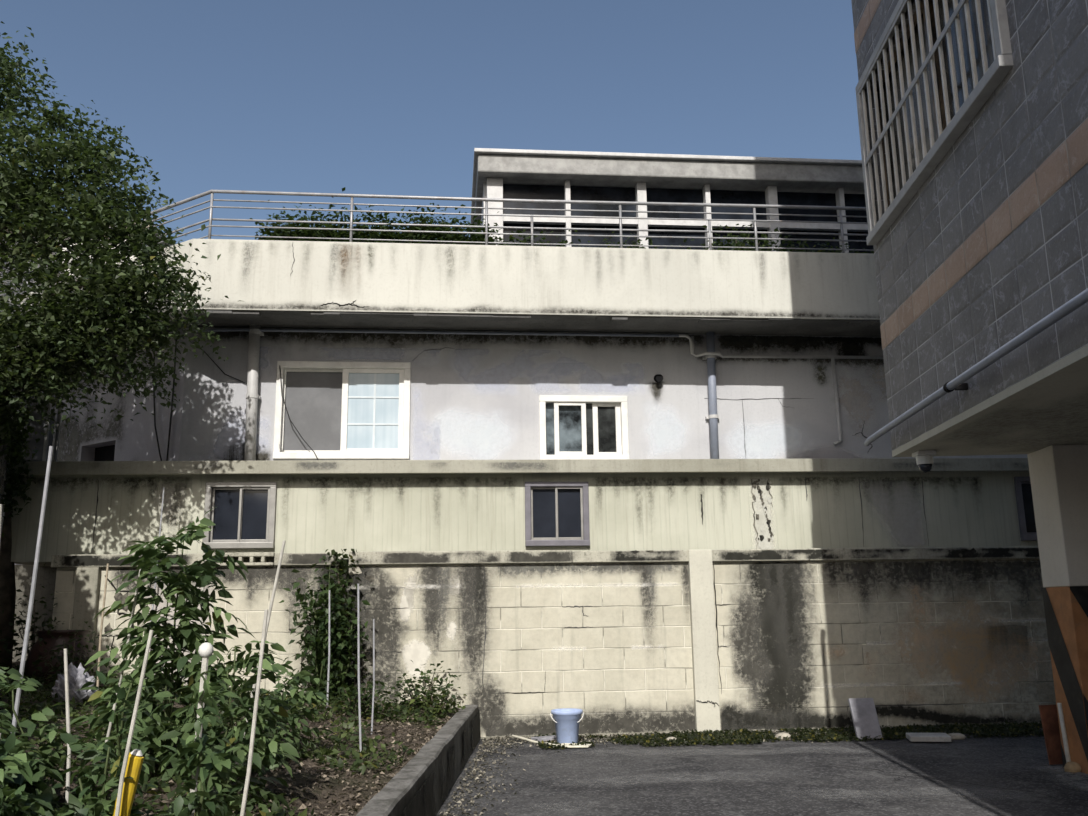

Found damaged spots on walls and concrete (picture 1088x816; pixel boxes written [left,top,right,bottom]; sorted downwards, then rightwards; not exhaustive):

water stain [0,386,124,509]
water stain [33,478,188,512]
water stain [287,478,512,494]
water stain [598,477,736,496]
peeling [751,478,774,550]
water stain [822,560,1043,603]
water stain [114,566,408,703]
water stain [421,563,695,748]
water stain [720,562,854,730]
water stain [875,706,1035,724]